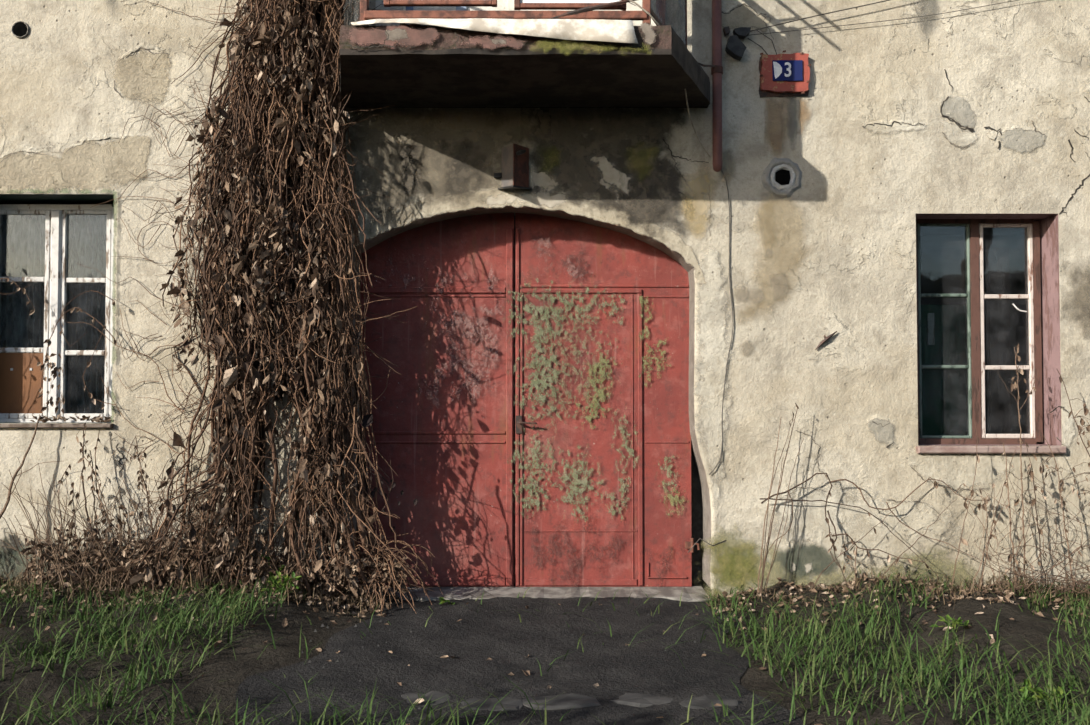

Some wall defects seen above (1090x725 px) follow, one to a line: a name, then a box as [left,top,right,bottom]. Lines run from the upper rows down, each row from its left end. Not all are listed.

spalling [114,42,171,103]
peeling [0,132,150,194]
damp [349,107,565,231]
damp [592,156,690,222]
crack [1059,129,1090,215]